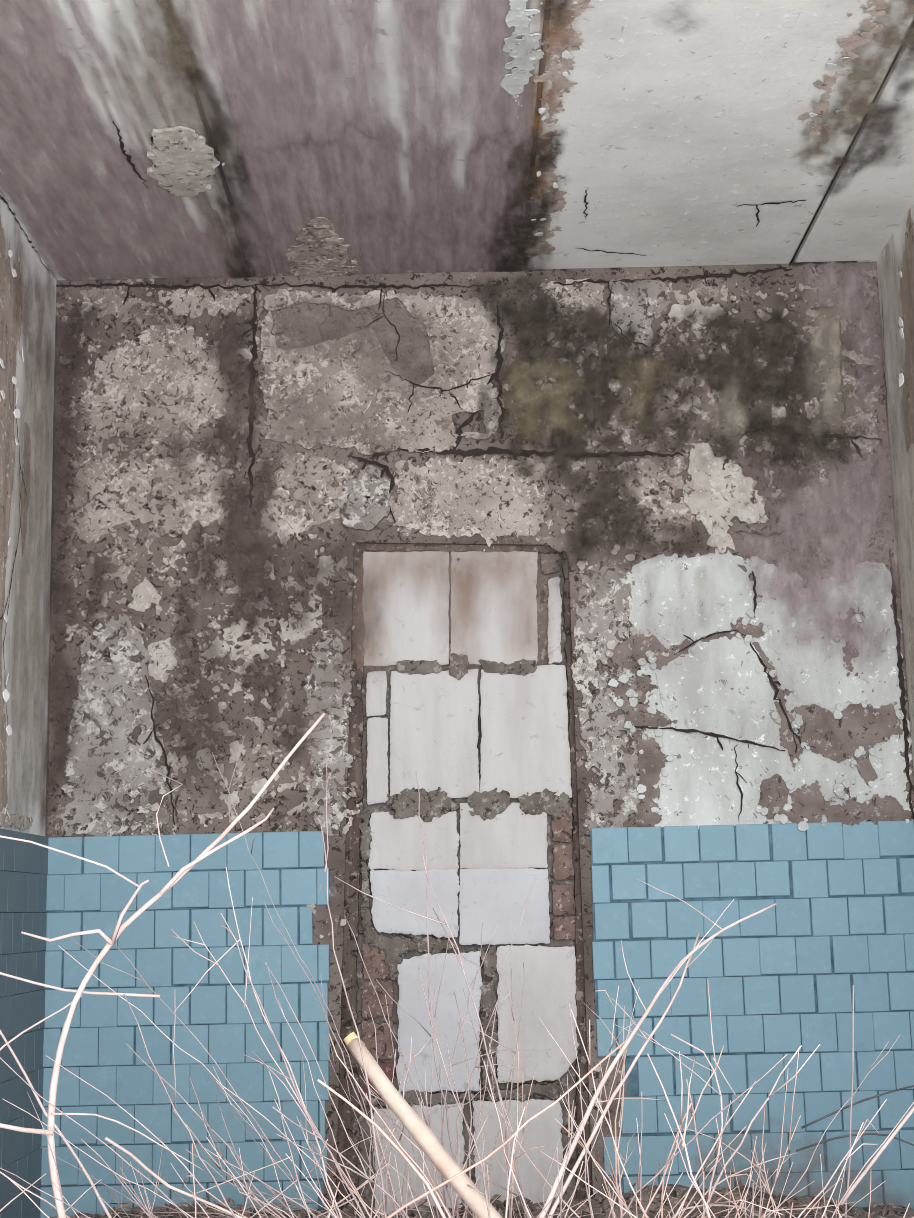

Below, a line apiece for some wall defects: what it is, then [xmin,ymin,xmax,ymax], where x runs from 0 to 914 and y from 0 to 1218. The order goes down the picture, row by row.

crack [112,121,171,192]
peeling [500,0,595,257]
peeling [0,215,33,831]
crack [0,195,683,523]
leakage [0,0,914,820]
crack [553,248,857,347]
crack [739,523,805,538]
crack [800,306,888,457]
crack [634,571,806,818]
crack [889,549,914,819]